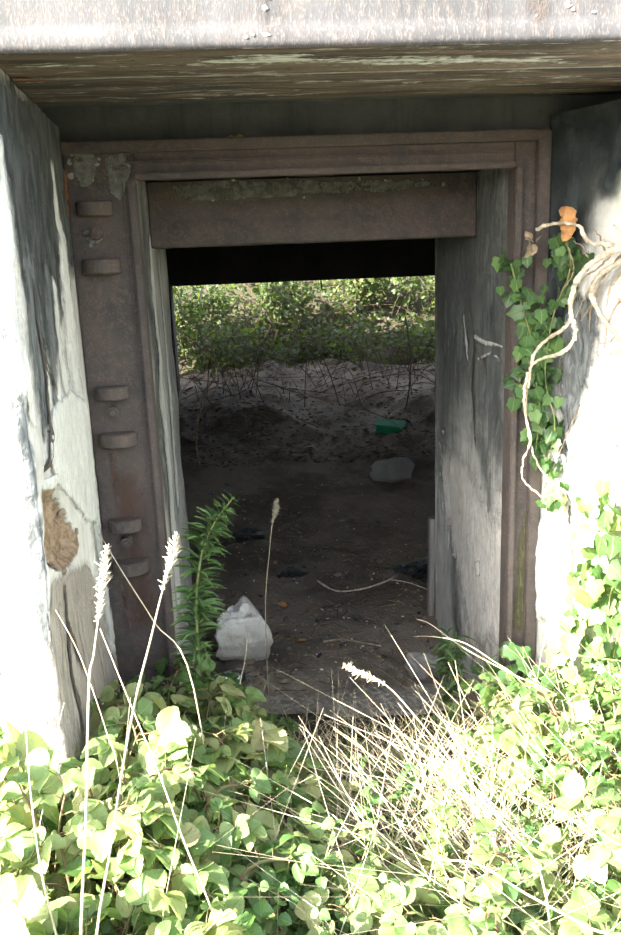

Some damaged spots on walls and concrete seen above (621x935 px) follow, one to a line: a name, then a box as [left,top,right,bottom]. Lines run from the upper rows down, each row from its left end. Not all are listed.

leakage [203,54,578,65]
leakage [551,104,621,256]
leakage [0,77,120,780]
peeling [41,389,98,575]
leakage [551,257,599,502]
rust [122,576,153,628]